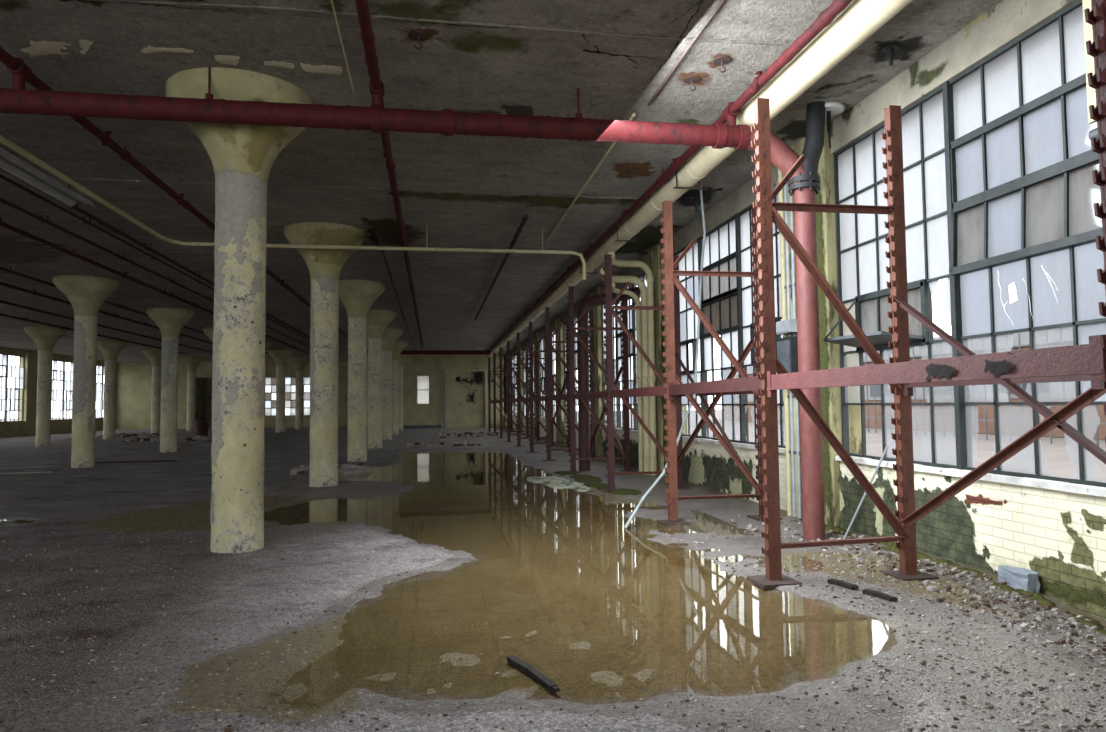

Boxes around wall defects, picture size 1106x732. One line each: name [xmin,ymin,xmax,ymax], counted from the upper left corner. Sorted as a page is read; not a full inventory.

mould [369,0,475,26]
crack [404,20,501,28]
flaking render [19,37,96,59]
flaking render [140,45,193,54]
mould [437,33,522,52]
crack [582,0,775,87]
flaking render [214,54,240,66]
flaking render [264,61,343,76]
peeling [210,167,267,481]